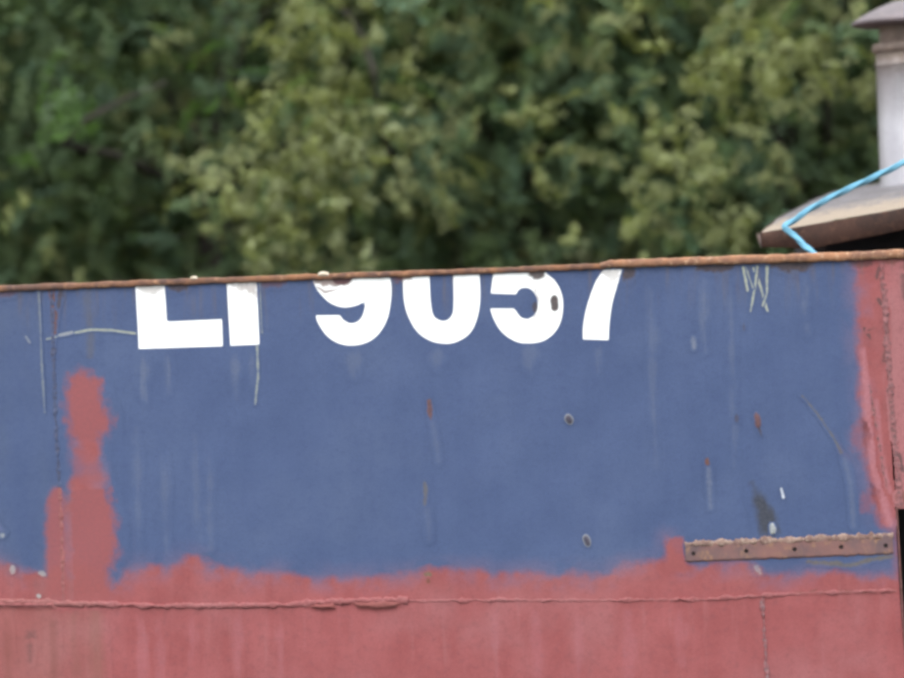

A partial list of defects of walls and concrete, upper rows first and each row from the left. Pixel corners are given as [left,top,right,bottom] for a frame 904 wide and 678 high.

rust [693,264,739,277]
rust [388,276,415,288]
rust [525,271,550,284]
peeling [52,358,132,613]
peeling [663,532,689,575]